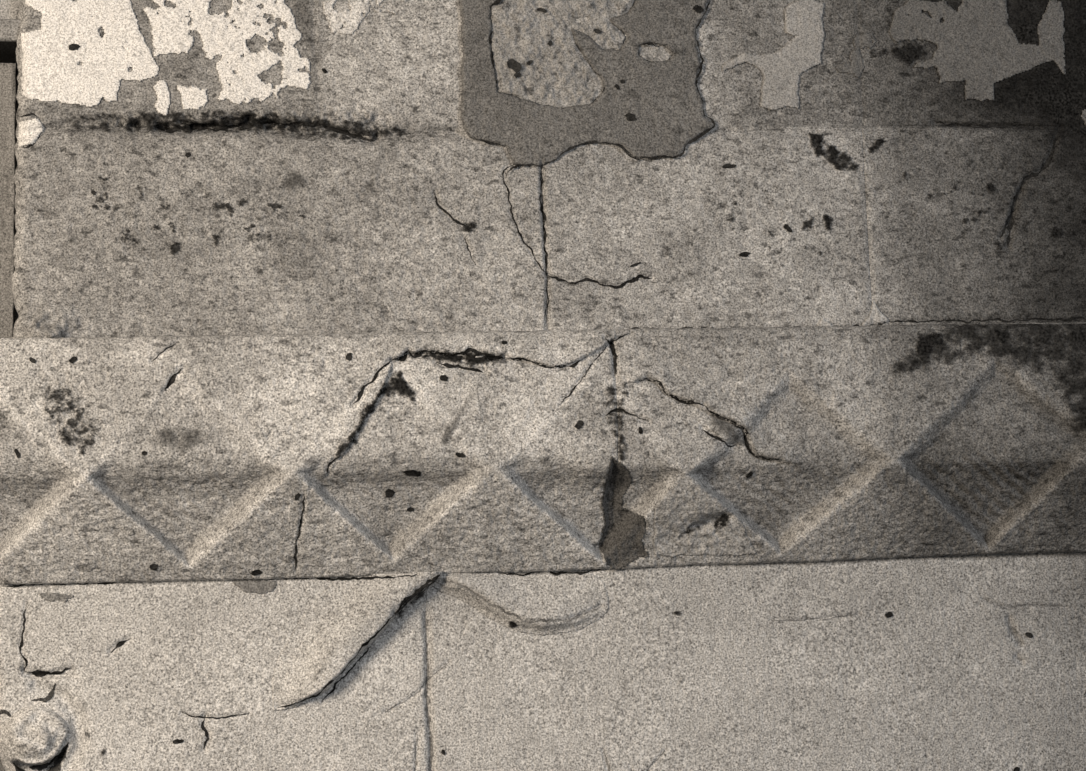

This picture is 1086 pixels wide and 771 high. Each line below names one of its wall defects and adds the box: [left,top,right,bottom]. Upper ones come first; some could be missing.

peeling [21,0,311,115]
crack [489,0,501,89]
peeling [722,0,825,110]
peeling [889,0,1066,101]
peeling [17,118,44,147]
crack [502,0,715,321]
crack [835,317,1086,326]
crack [353,327,779,460]
crack [257,494,601,771]
crack [182,712,249,748]